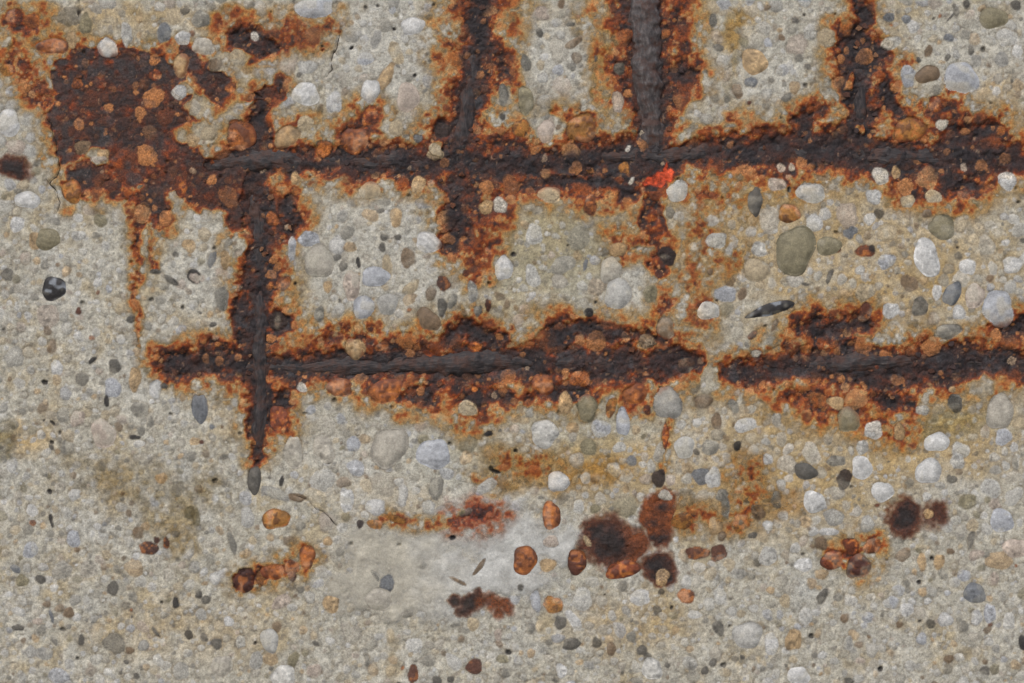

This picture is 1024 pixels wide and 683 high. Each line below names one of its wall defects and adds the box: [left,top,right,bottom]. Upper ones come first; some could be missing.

rust [0,0,1024,538]
spalling [46,0,1024,466]
rust [221,538,327,597]
rust [447,587,513,618]
rust [577,454,776,588]
rust [817,495,948,588]